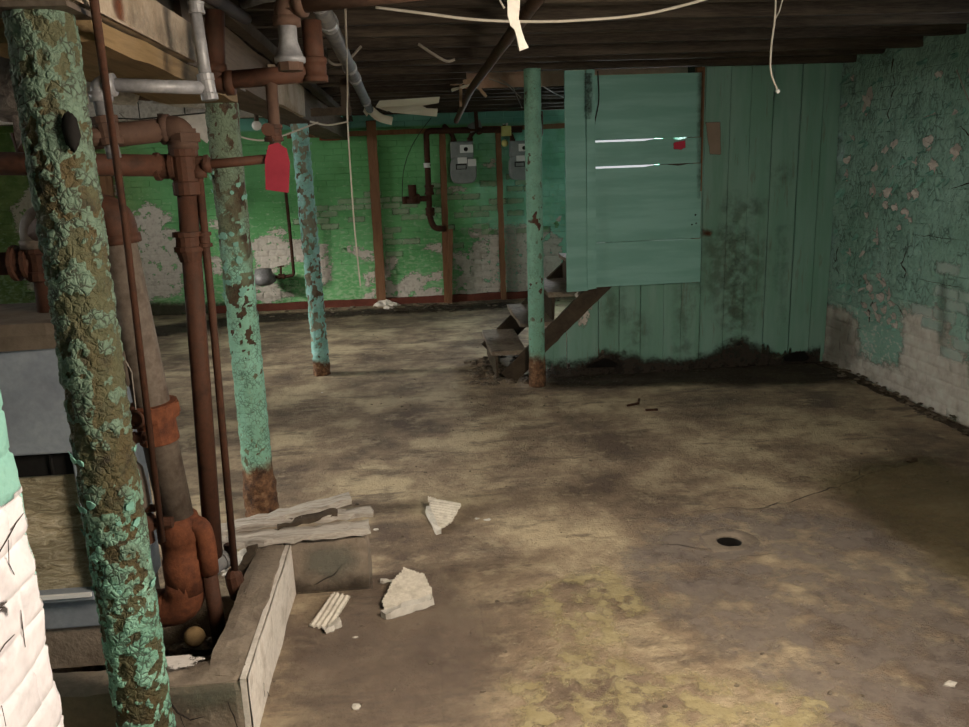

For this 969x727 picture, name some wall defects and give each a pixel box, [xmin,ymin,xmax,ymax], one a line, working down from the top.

peeling [912,135,969,176]
peeling [132,201,184,301]
peeling [209,174,528,303]
peeling [543,216,563,278]
peeling [867,184,919,232]
peeling [822,273,969,428]
crack [0,513,24,575]
peeling [75,501,96,514]
peeling [116,501,140,527]
crack [0,606,26,652]